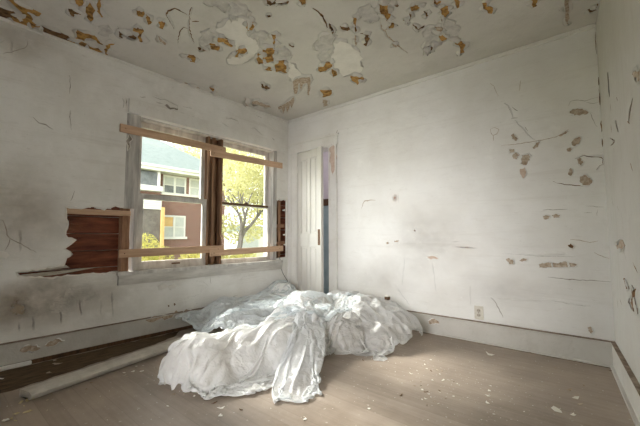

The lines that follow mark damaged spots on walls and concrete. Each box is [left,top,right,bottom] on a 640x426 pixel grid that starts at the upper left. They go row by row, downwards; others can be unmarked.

peeling [0,0,167,55]
peeling [174,0,470,115]
spalling [568,108,589,117]
spalling [509,141,541,179]
spalling [559,130,582,152]
spalling [568,158,593,187]
flaking render [15,205,121,280]
spalling [539,260,578,268]
peeling [623,278,638,315]
peeling [0,331,179,393]